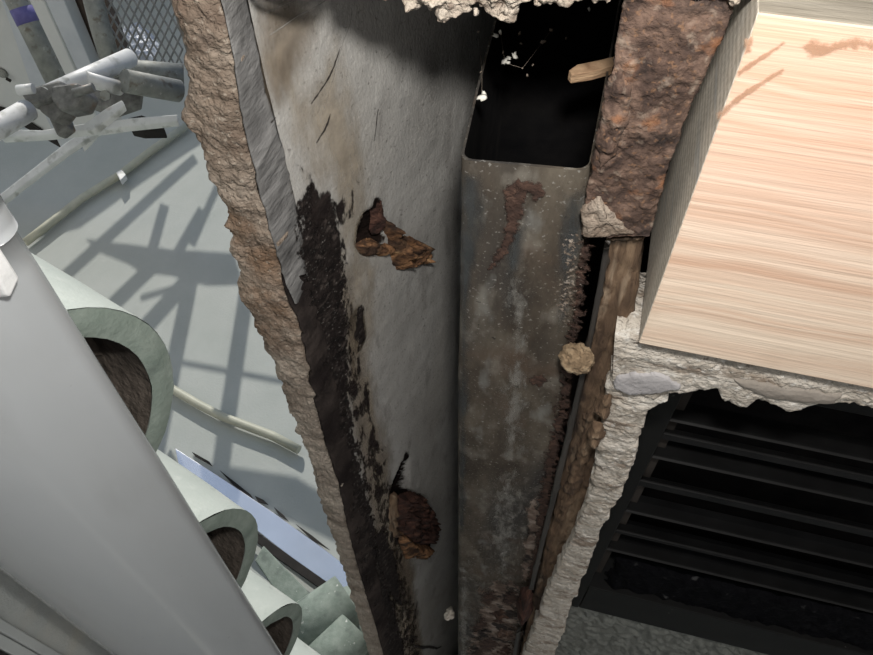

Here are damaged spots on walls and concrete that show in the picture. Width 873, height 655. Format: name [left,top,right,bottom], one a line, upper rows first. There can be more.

spalling [402,0,611,77]
rust [487,179,546,270]
spalling [172,0,383,655]
rust [553,232,594,344]
spalling [586,393,612,449]
rust [466,370,575,655]